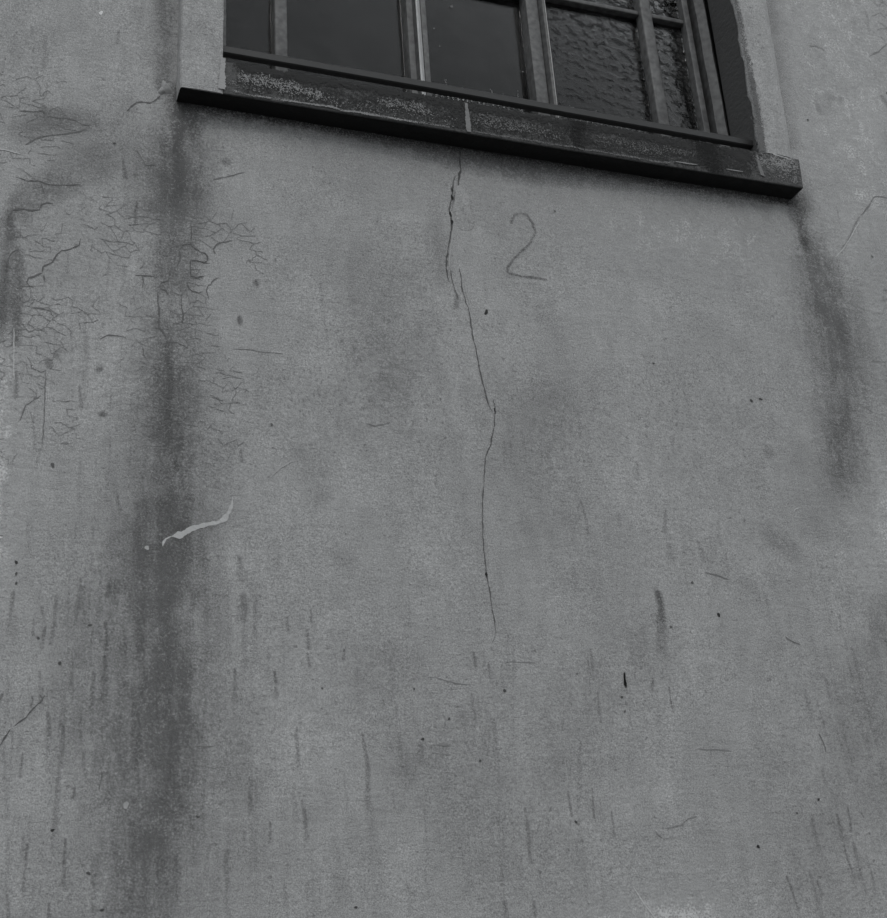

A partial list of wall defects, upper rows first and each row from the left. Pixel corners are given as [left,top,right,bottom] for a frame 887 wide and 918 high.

water stain [127,320,199,895]
water stain [148,88,204,254]
peeling [162,496,233,546]
crack [446,148,496,643]